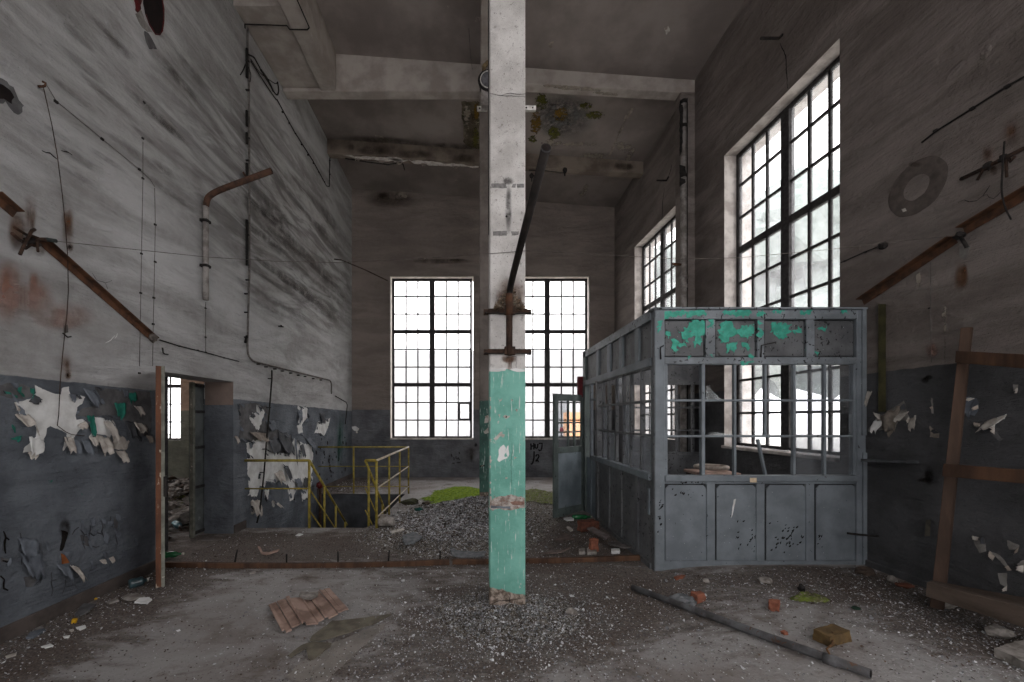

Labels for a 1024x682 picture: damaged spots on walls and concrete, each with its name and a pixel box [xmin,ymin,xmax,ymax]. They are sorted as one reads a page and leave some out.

spalling [0,78,24,115]
damp [528,85,617,158]
spalling [344,155,479,169]
peeling [0,383,155,463]
peeling [480,397,518,468]
peeling [864,391,916,437]
peeling [965,397,1007,441]
peeling [235,402,405,528]
spalling [489,482,525,511]
spalling [57,522,88,583]
peeling [972,536,1024,592]